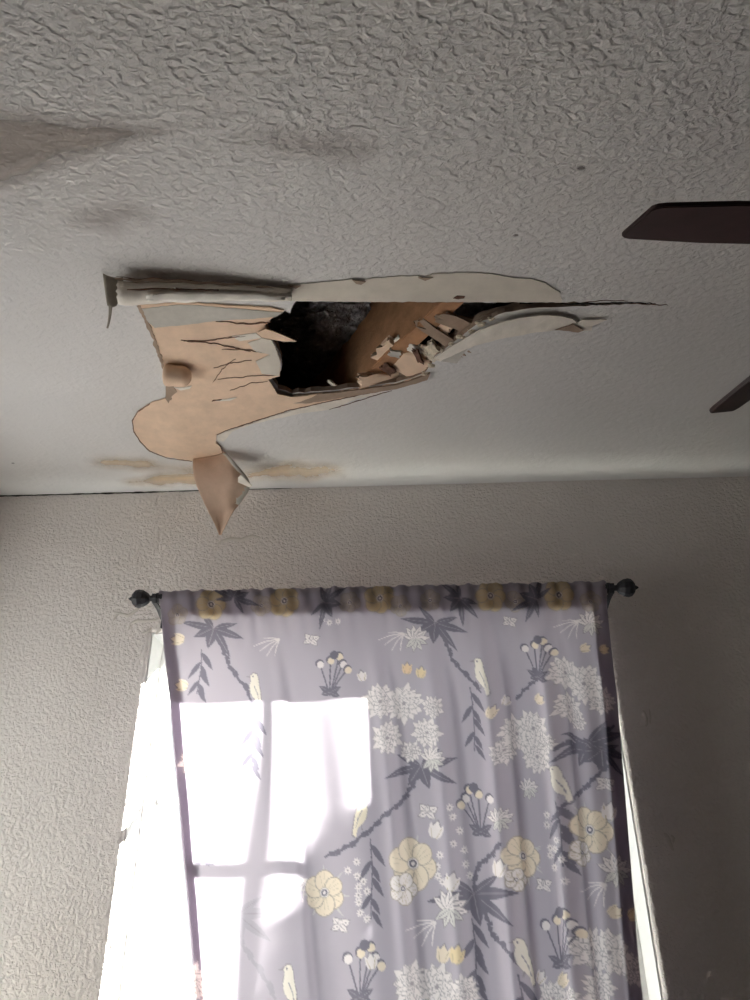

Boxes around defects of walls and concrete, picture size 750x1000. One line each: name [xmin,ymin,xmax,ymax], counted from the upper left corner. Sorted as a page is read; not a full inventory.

peeling [277,272,562,303]
peeling [434,315,607,363]
peeling [217,391,390,442]